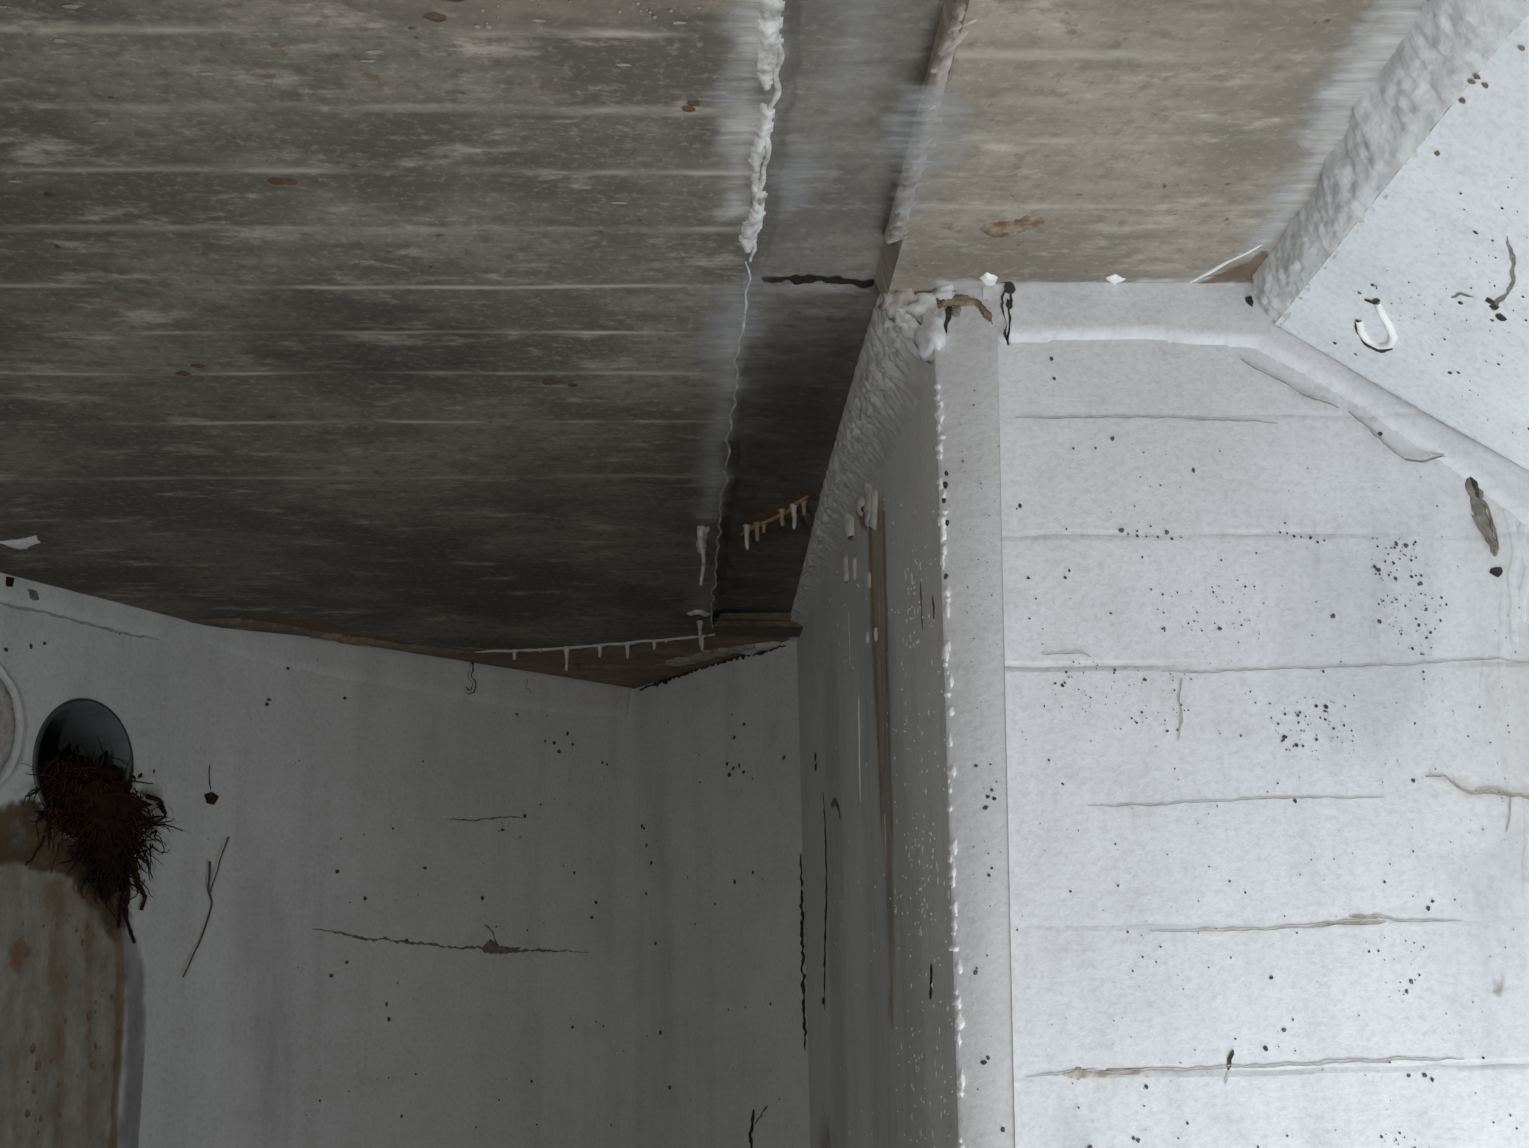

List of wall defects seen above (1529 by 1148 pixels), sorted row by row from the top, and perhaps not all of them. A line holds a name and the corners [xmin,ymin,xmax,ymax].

water stain [1241,0,1429,259]
crack [762,275,875,288]
crack [920,587,934,629]
crack [1425,775,1529,832]
crack [799,753,841,1049]
crack [312,924,588,954]
water stain [125,968,143,1148]
crack [1027,1050,1464,1084]